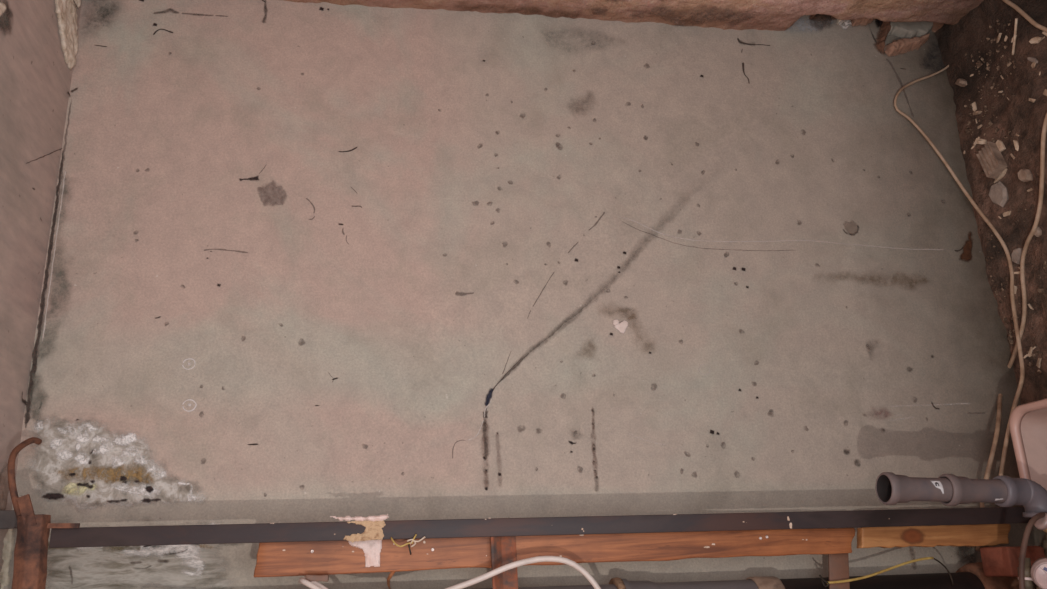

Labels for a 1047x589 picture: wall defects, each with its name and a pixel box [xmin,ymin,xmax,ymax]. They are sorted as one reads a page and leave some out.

spalling [55,0,81,70]
water stain [30,417,205,509]
water stain [46,522,232,589]
peeling [330,514,389,567]